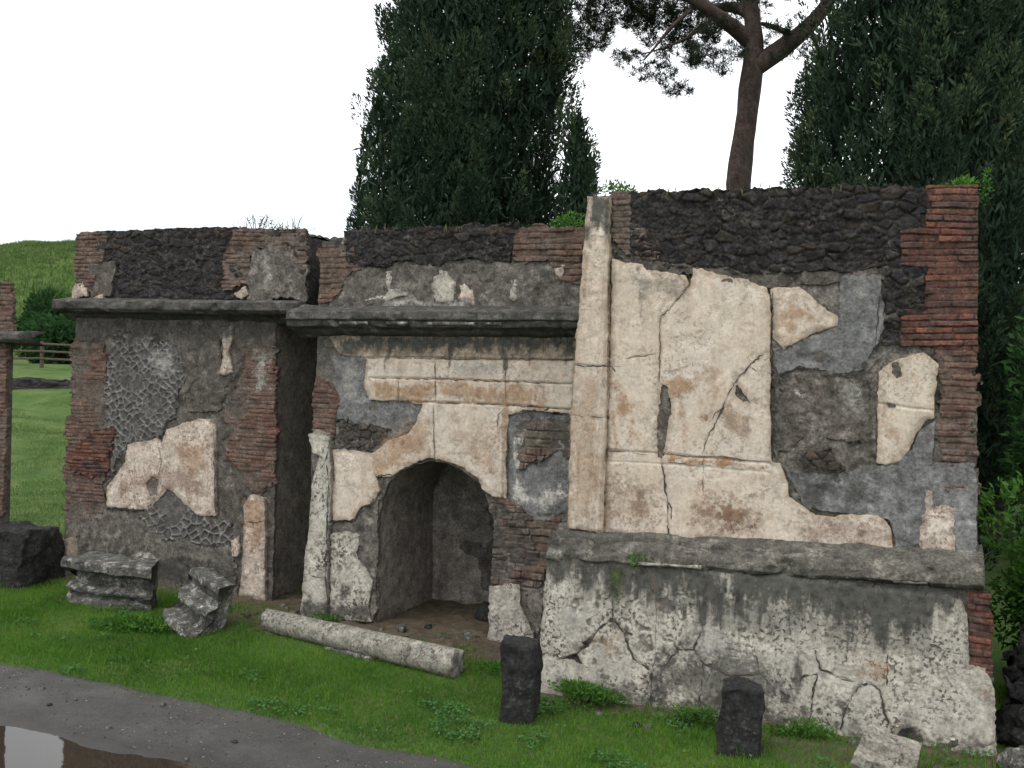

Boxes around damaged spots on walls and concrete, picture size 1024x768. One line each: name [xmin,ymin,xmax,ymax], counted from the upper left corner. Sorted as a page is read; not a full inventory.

water stain [340,335,574,376]
spalling [508,411,570,523]
crack [661,461,672,534]
crack [702,296,884,491]
spalling [783,275,844,343]
spalling [770,339,896,499]
water stain [546,526,967,650]
crack [798,650,893,733]